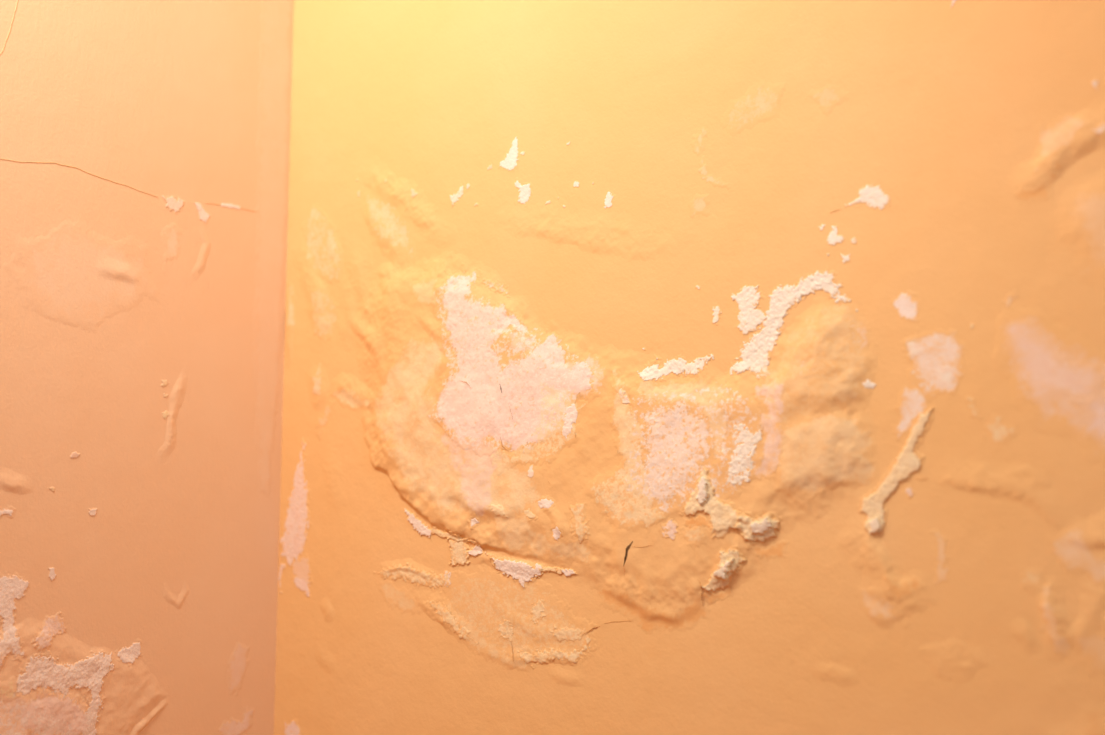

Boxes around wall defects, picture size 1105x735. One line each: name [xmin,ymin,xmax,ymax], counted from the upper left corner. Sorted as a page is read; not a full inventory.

crack [2,159,156,197]
peeling [448,181,471,209]
peeling [487,136,534,208]
peeling [603,189,616,210]
peeling [818,224,857,265]
peeling [857,290,968,539]
flaking render [373,263,784,676]
flaking render [278,437,314,598]
peeling [0,563,144,735]